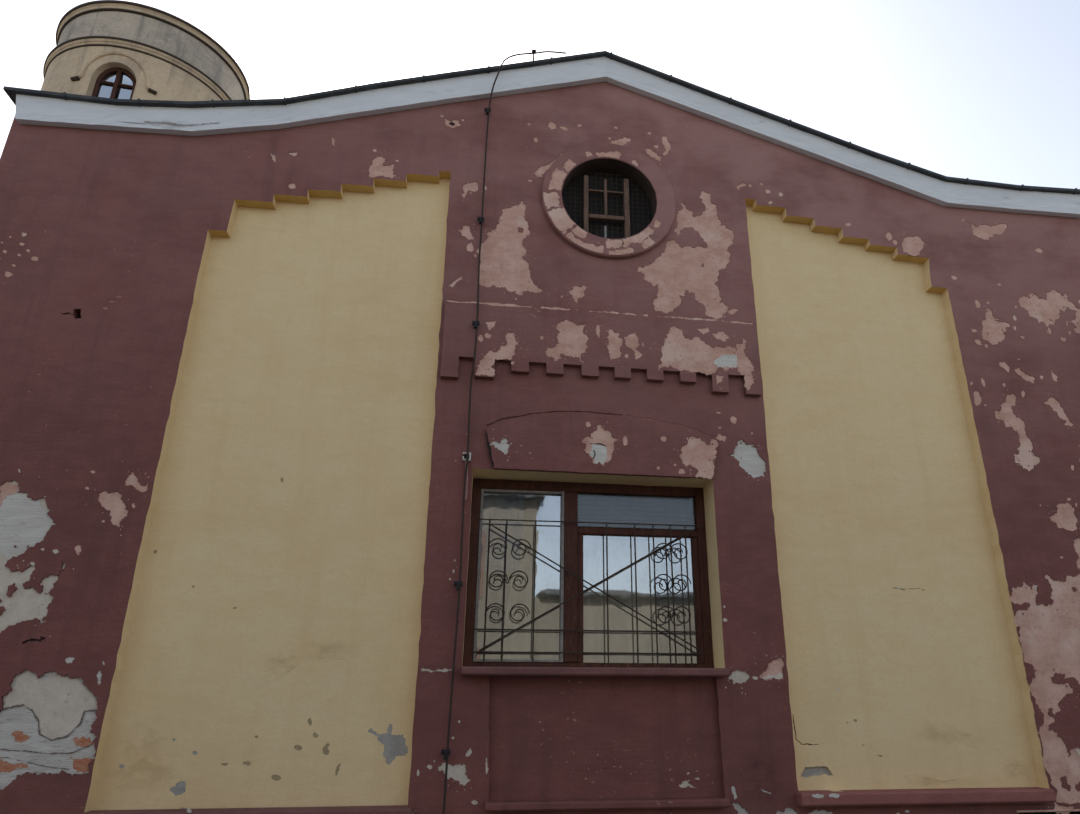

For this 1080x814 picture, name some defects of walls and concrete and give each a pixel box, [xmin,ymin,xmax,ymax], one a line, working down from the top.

peeling [585,126,638,166]
peeling [646,132,671,161]
peeling [447,153,755,390]
peeling [971,290,1080,348]
peeling [582,421,628,466]
peeling [661,412,766,481]
peeling [970,359,1058,471]
peeling [1044,395,1080,429]
peeling [85,461,149,536]
spalling [0,469,74,633]
peeling [1009,498,1080,814]
flaking render [0,657,105,790]